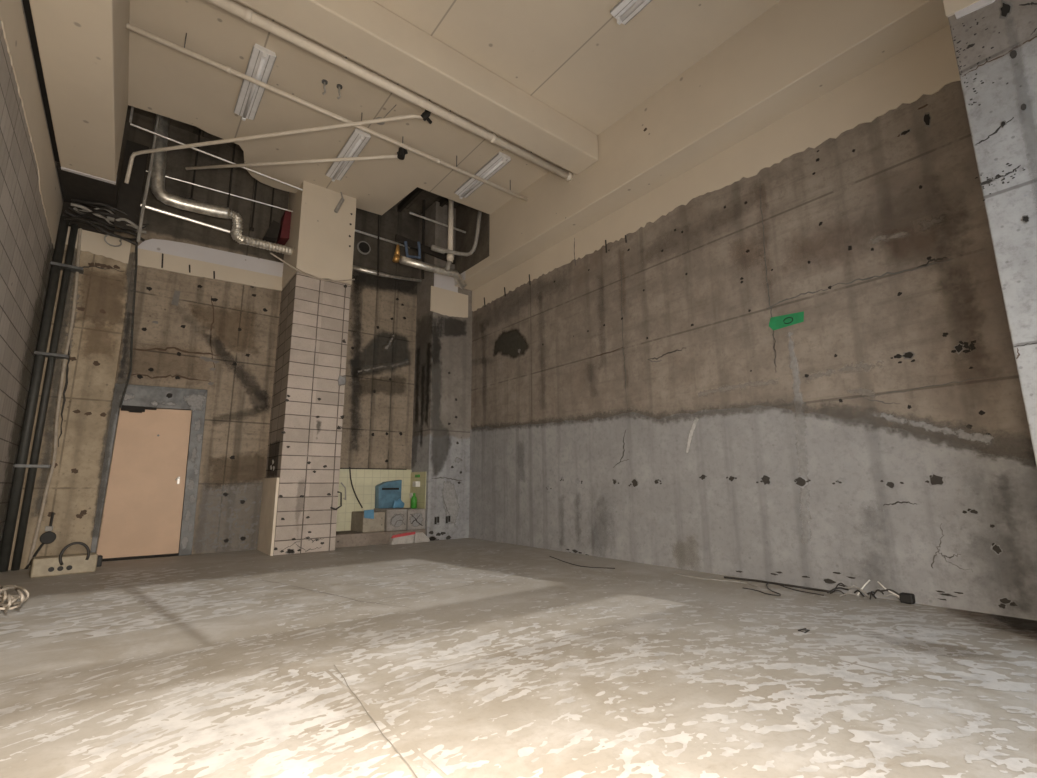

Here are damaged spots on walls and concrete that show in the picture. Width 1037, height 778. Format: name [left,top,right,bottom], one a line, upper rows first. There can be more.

crack [977,117,1014,144]
water stain [493,329,528,358]
crack [931,527,973,572]